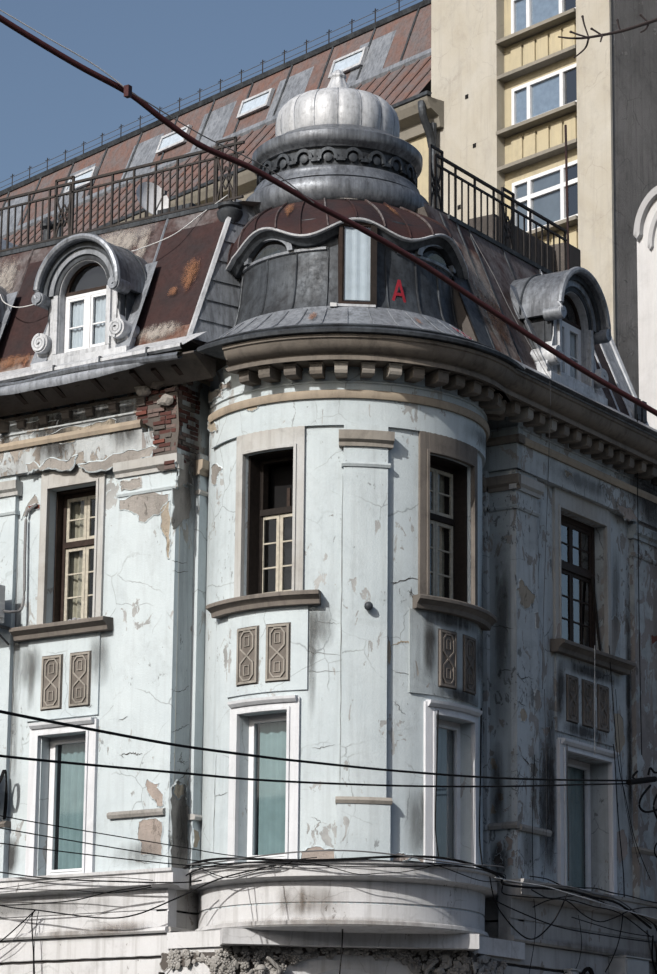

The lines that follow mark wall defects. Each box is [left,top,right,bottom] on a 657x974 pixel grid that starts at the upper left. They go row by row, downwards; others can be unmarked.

corrosion [169,262,196,294]
flaking render [21,380,231,559]
crack [308,536,342,749]
spalling [137,778,200,869]
damp [494,766,502,814]
damp [547,725,555,831]
peeling [617,828,628,865]